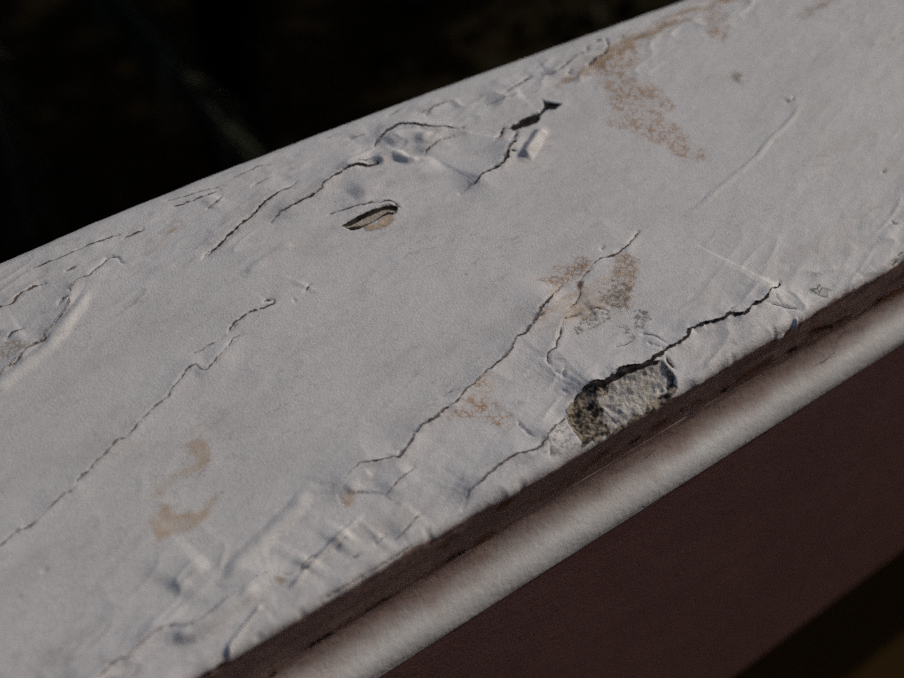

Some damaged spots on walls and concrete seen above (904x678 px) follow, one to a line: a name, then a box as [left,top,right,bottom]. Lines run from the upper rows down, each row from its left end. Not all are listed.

crack [170,102,462,255]
peeling [342,204,398,230]
crack [465,128,517,190]
crack [0,230,143,375]
crack [0,299,275,545]
crack [349,233,639,495]
spalling [566,360,677,447]
crack [464,282,797,500]